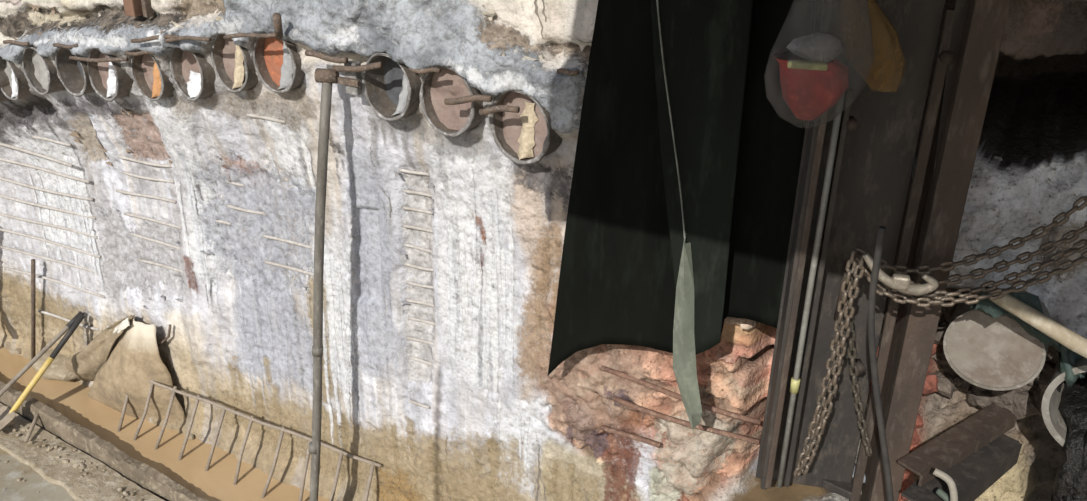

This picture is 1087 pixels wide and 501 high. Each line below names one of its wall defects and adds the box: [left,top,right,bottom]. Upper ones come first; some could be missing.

crack [534,0,546,38]
rust [602,411,649,501]
spalling [601,425,661,448]
spalling [612,396,761,445]